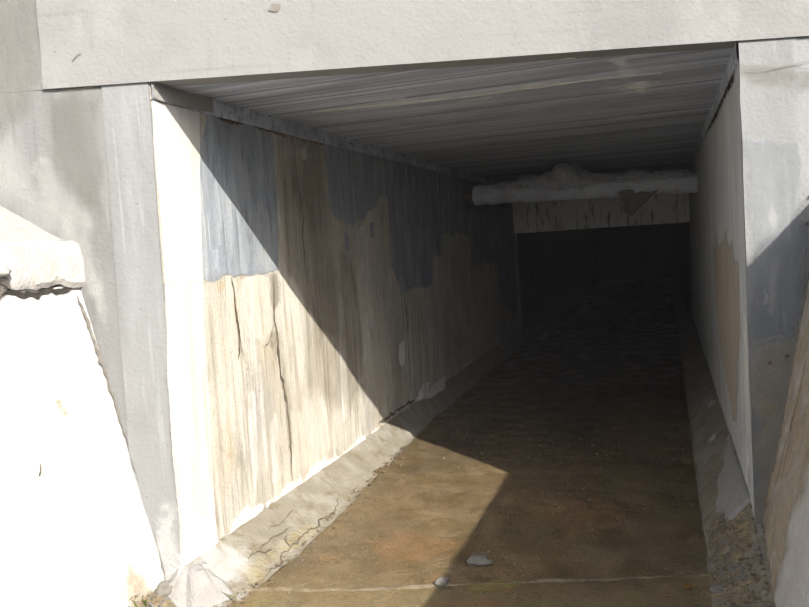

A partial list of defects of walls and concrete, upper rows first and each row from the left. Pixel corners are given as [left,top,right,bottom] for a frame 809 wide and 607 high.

peeling [199,115,278,282]
peeling [386,159,518,313]
crack [231,278,244,360]
crack [266,273,292,473]
crack [379,298,415,423]
peeling [713,231,740,421]
crack [248,498,339,578]
leakage [230,428,378,533]